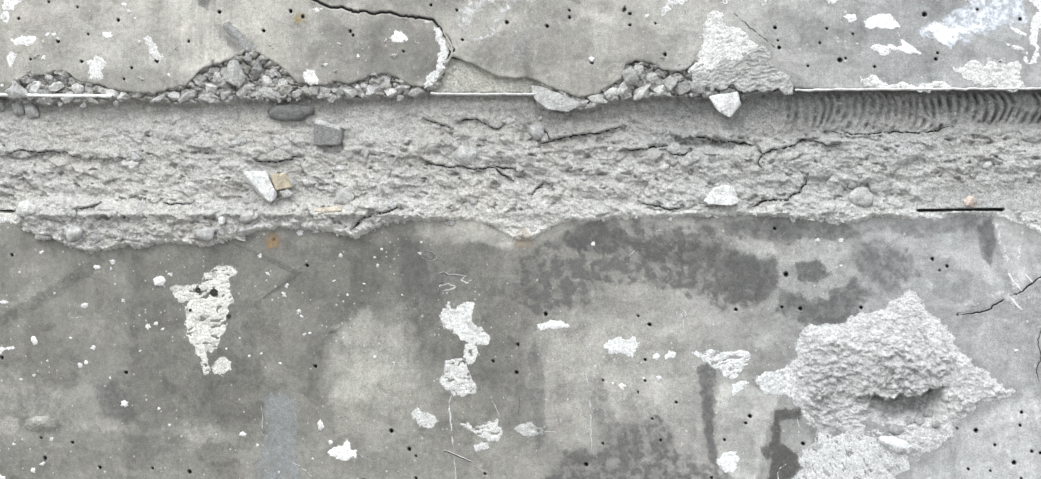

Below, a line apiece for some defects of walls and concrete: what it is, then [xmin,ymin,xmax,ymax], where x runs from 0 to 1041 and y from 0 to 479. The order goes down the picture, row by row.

peeling [303,69,319,85]
crack [307,0,454,83]
peeling [169,265,237,376]
peeling [439,301,490,345]
leakage [520,221,777,314]
leakage [777,245,919,325]
crack [958,273,1041,382]
peeling [433,358,477,397]
leakage [550,416,706,479]
leakage [697,364,717,462]
leakage [761,408,801,479]
spalling [691,288,1016,479]